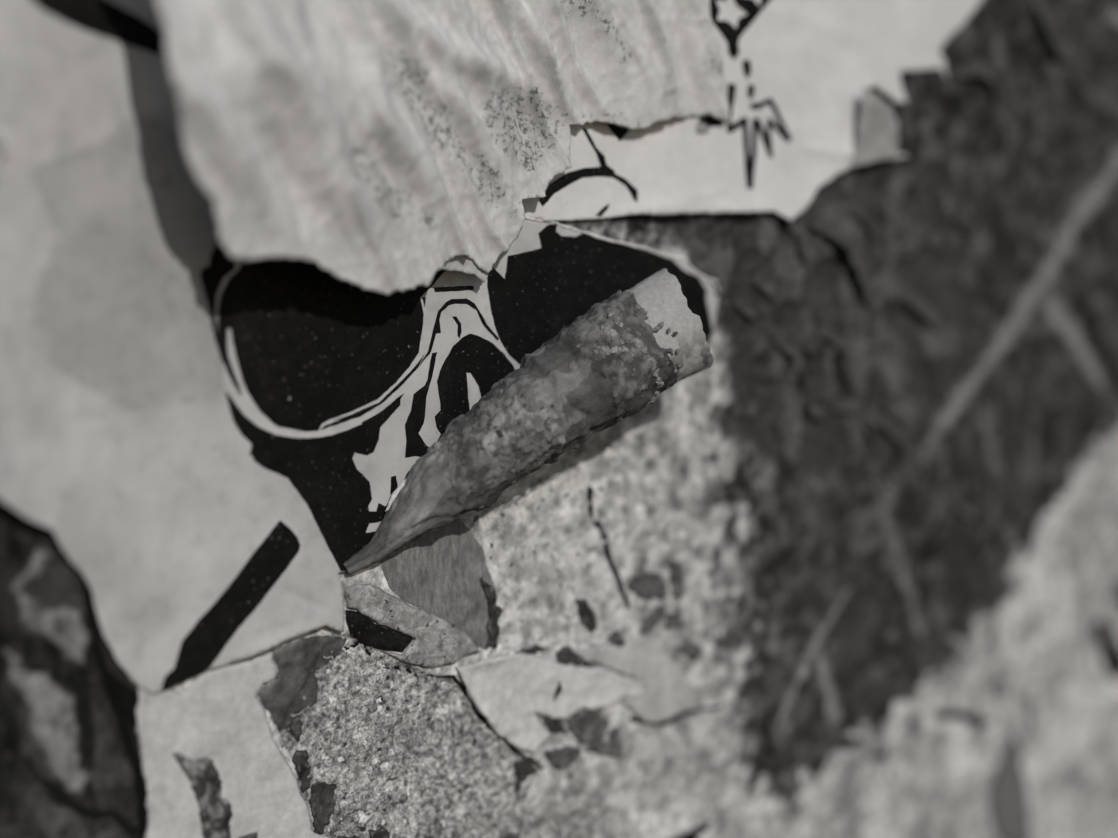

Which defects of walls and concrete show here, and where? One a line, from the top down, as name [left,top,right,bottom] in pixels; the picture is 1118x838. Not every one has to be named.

peeling [593,310,664,405]
spalling [479,447,685,666]
spalling [258,634,623,838]
crack [343,641,543,769]
crack [629,705,722,727]
peeling [677,641,702,661]